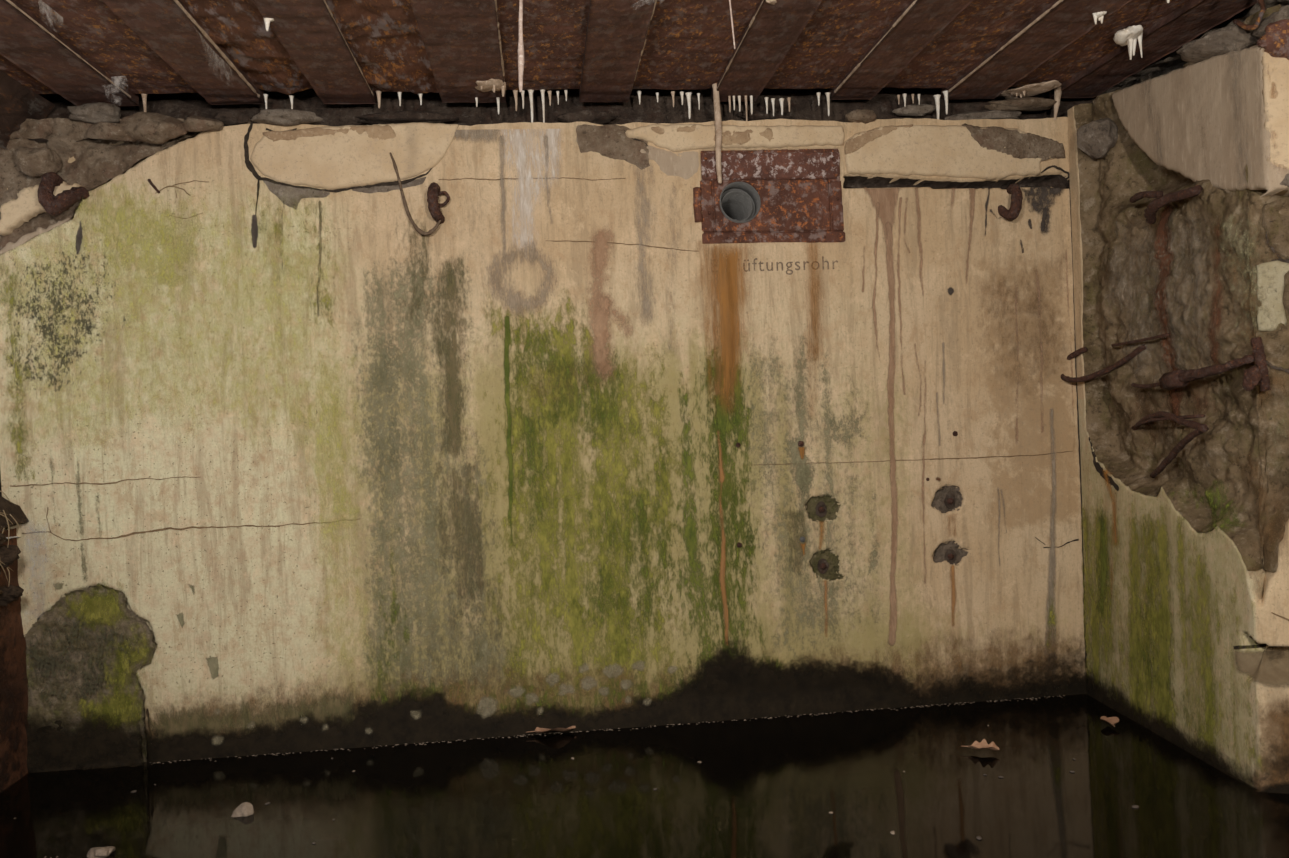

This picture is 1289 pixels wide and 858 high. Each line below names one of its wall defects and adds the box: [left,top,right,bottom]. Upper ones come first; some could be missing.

damp [1092,11,1107,24]
damp [1113,25,1143,60]
spalling [0,112,251,255]
rust [706,247,744,407]
spalling [843,90,1289,572]
crack [10,476,359,541]
damp [24,180,1289,794]
rust [718,438,728,646]
crack [1233,612,1289,649]